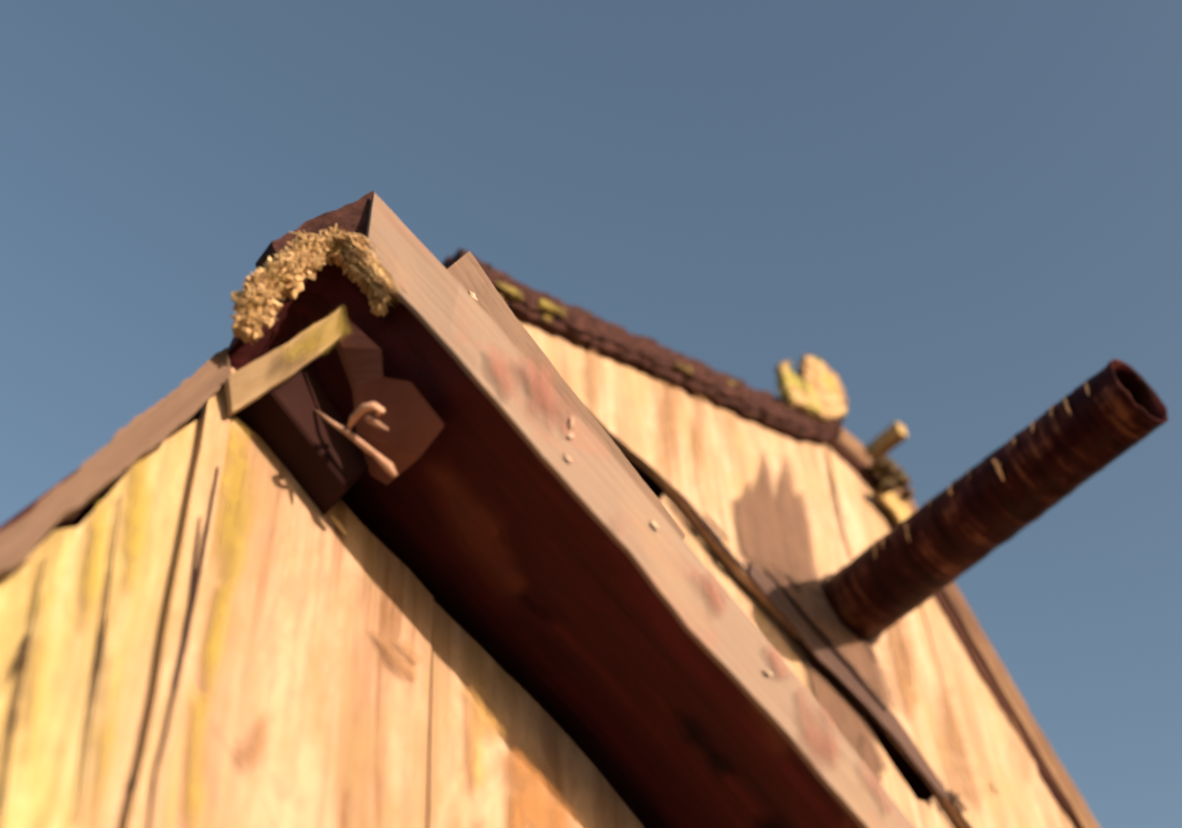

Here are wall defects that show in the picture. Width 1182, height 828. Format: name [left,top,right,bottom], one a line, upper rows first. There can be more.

crack [148,466,219,828]